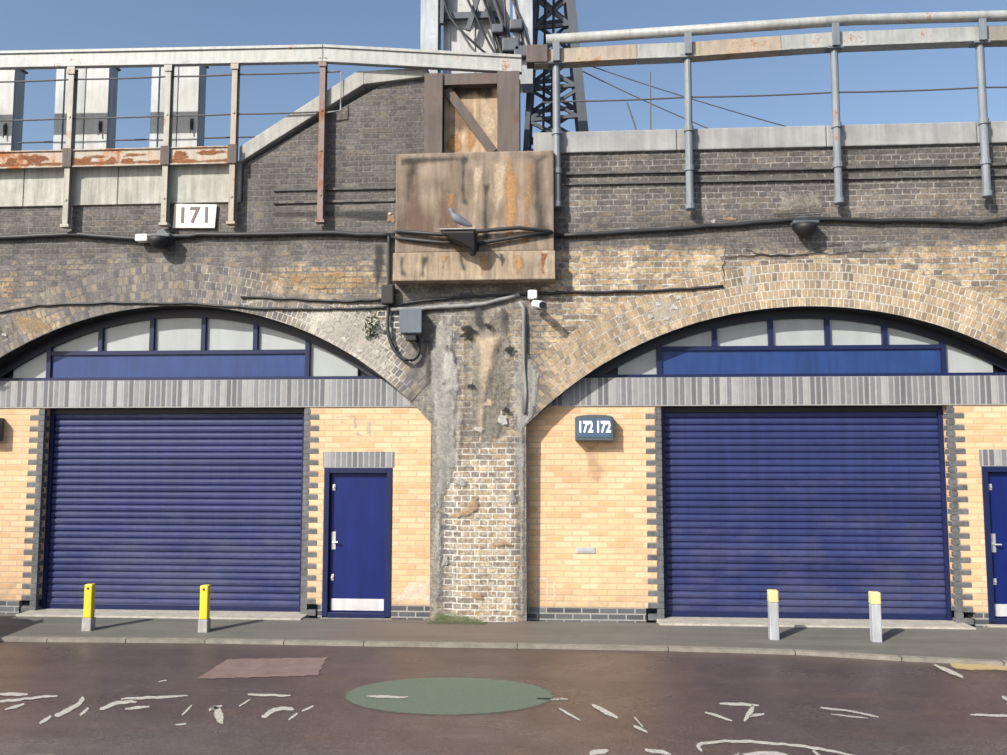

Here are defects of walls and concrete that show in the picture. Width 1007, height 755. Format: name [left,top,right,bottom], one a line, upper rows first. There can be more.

rust [0,149,227,167]
rust [474,168,482,201]
rust [492,162,531,239]
leakage [475,308,498,388]
leakage [443,349,457,390]